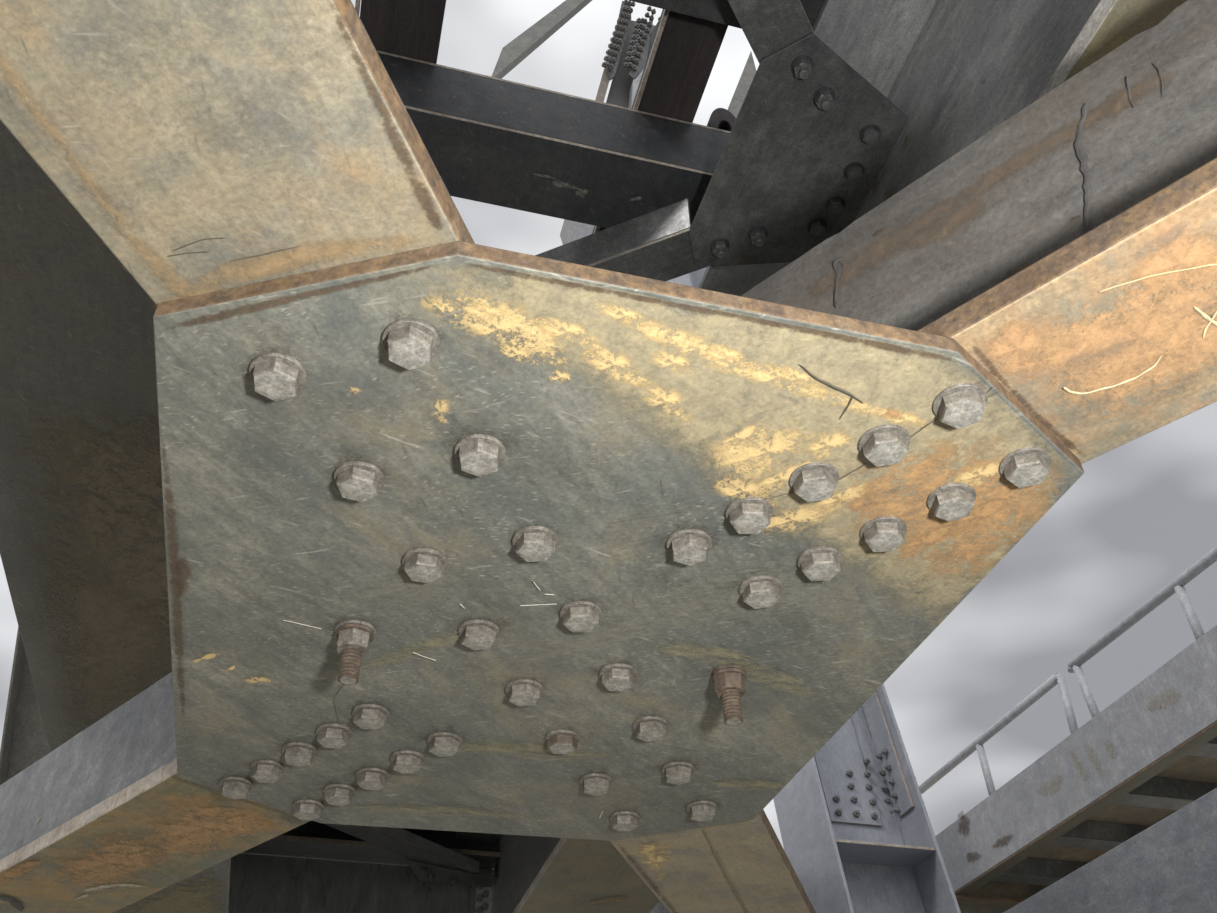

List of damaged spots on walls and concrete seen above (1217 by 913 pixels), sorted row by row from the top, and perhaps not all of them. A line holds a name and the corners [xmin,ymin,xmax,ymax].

crack [1075,102,1092,233]
corrosion [180,266,429,326]
peeling [424,293,693,420]
peeling [597,303,925,427]
peeling [714,424,867,532]
corrosion [438,236,1217,623]
crack [799,364,864,419]
peeling [955,462,1000,487]
corrosion [0,861,40,885]
corrosion [58,801,274,885]